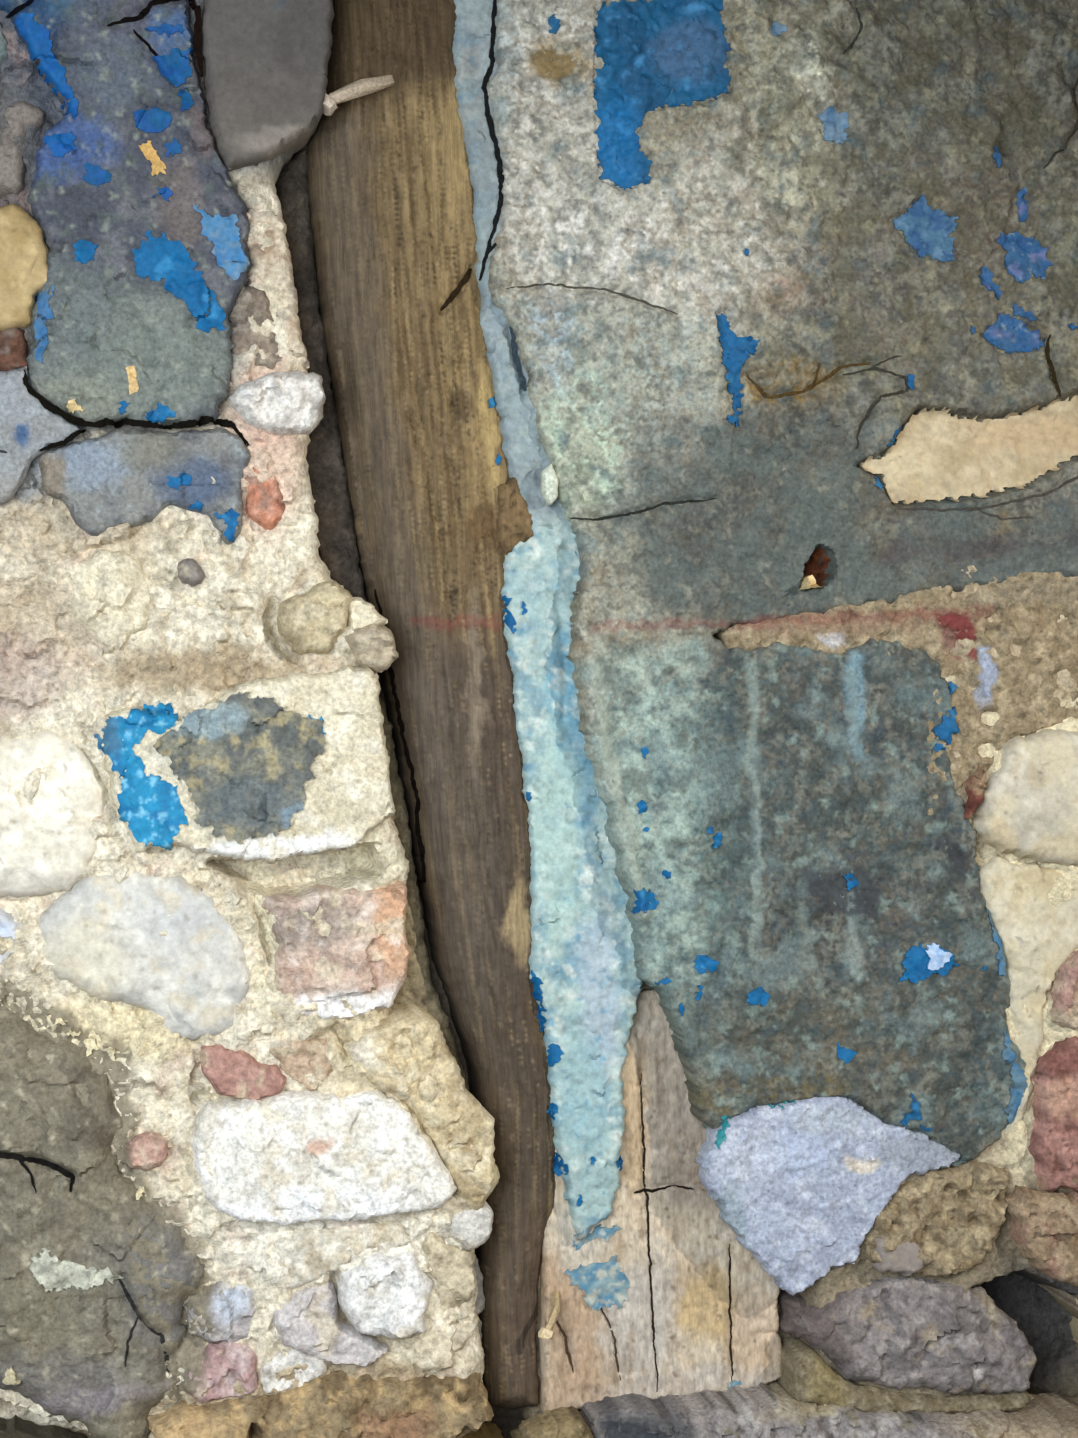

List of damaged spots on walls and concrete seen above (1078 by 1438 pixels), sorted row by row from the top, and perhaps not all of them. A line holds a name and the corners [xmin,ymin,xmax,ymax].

peeling [14,13,111,187]
peeling [133,22,195,202]
crack [440,0,678,315]
peeling [593,0,731,191]
peeling [132,204,250,333]
crack [0,369,250,453]
crack [509,326,527,391]
flaking render [860,395,1078,505]
spalling [799,548,831,590]
peeling [94,692,327,851]
flaking render [713,572,1078,815]
crack [0,1151,75,1193]